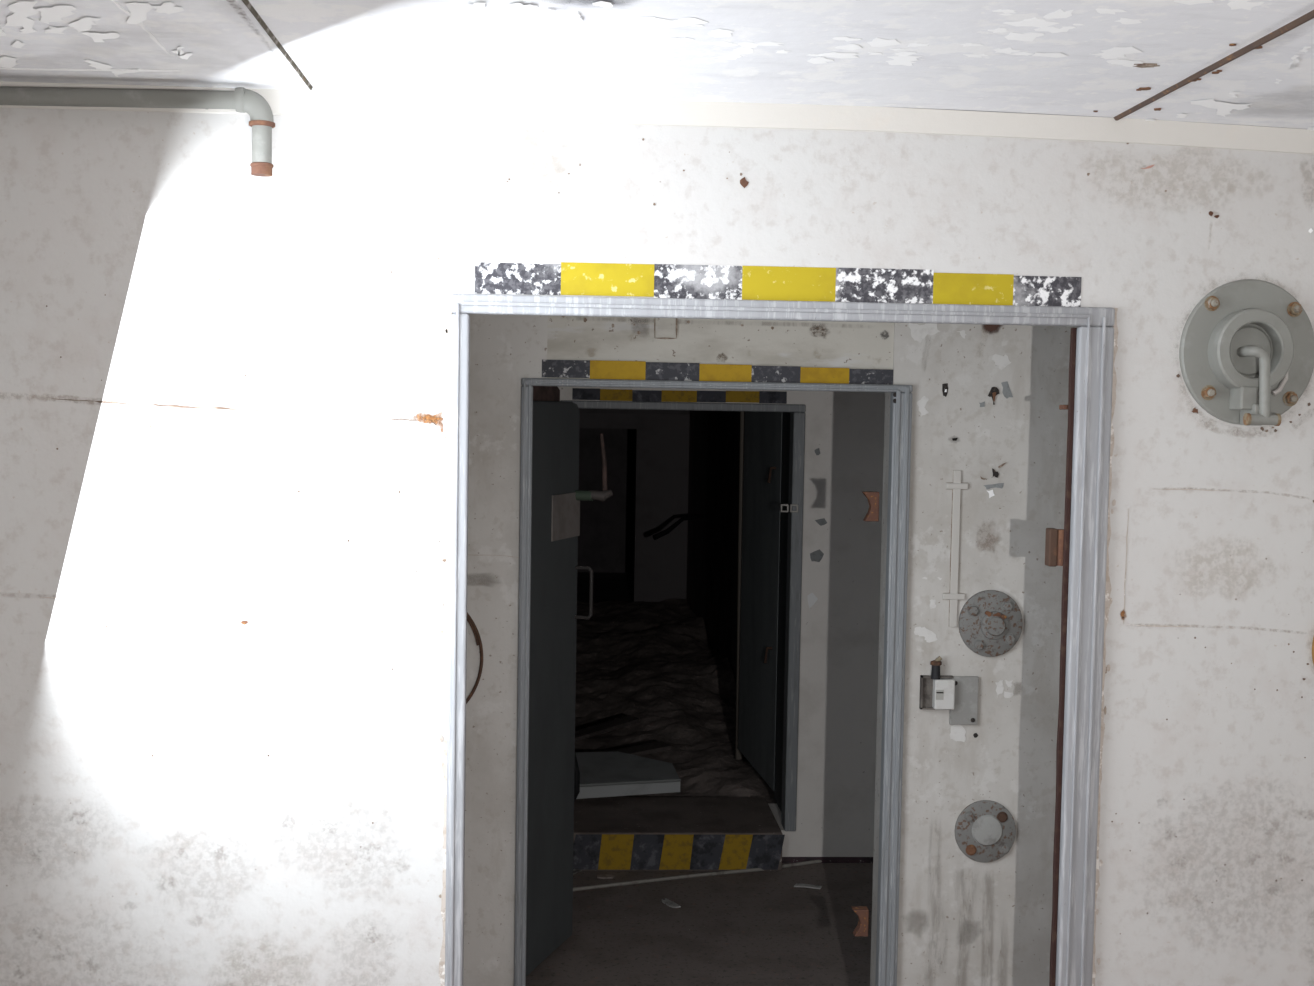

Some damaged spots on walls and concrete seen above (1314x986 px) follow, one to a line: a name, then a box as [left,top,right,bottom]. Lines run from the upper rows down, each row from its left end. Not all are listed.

peeling [0,0,184,69]
peeling [84,59,140,78]
flaking render [979,354,1013,407]
crack [52,398,267,411]
peeling [917,383,948,417]
rust [415,412,443,432]